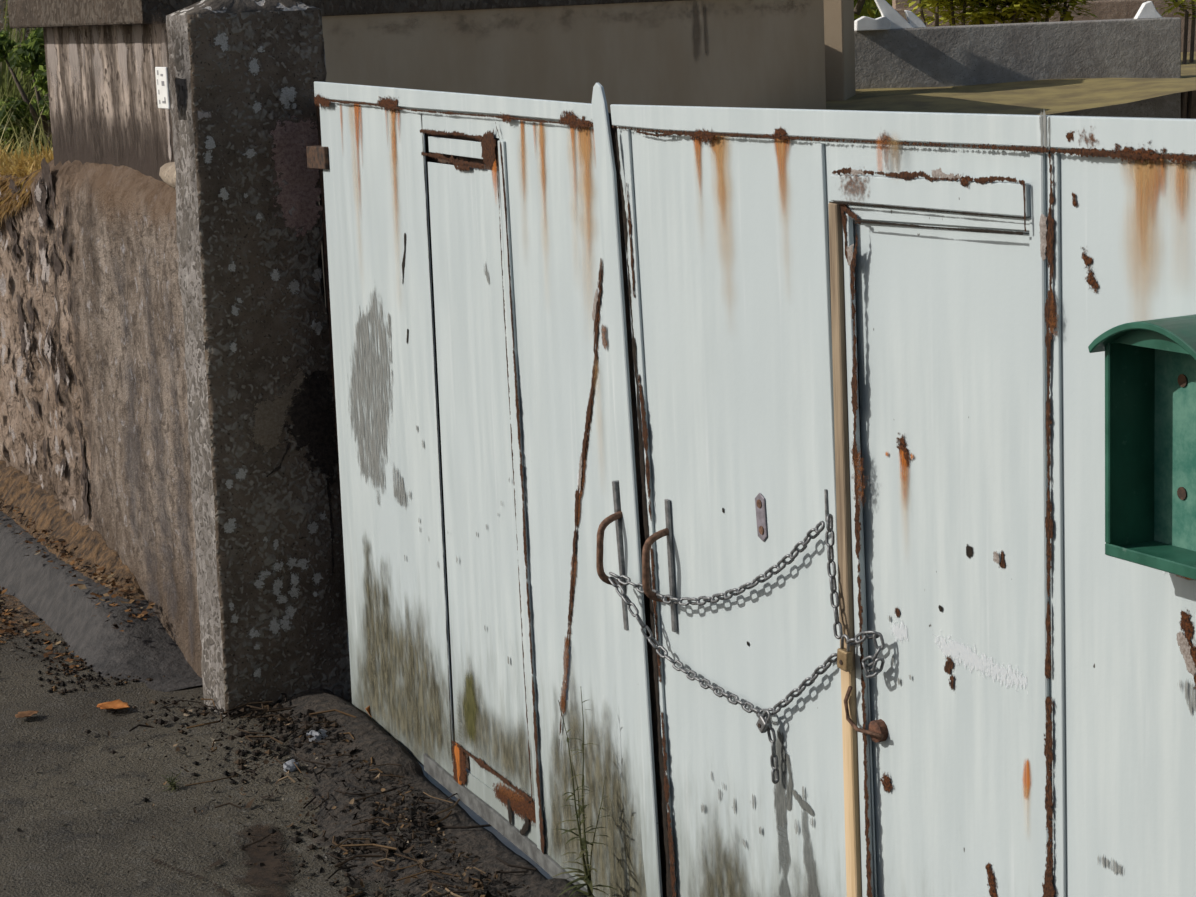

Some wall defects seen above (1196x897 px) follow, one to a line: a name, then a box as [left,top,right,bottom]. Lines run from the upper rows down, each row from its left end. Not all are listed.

corrosion [314,93,595,201]
corrosion [612,110,1196,228]
corrosion [1081,246,1098,293]
corrosion [885,434,913,489]
mould [360,546,530,790]
corrosion [452,741,536,835]
mould [553,718,645,897]
damp [759,732,819,897]
damp [703,857,743,897]